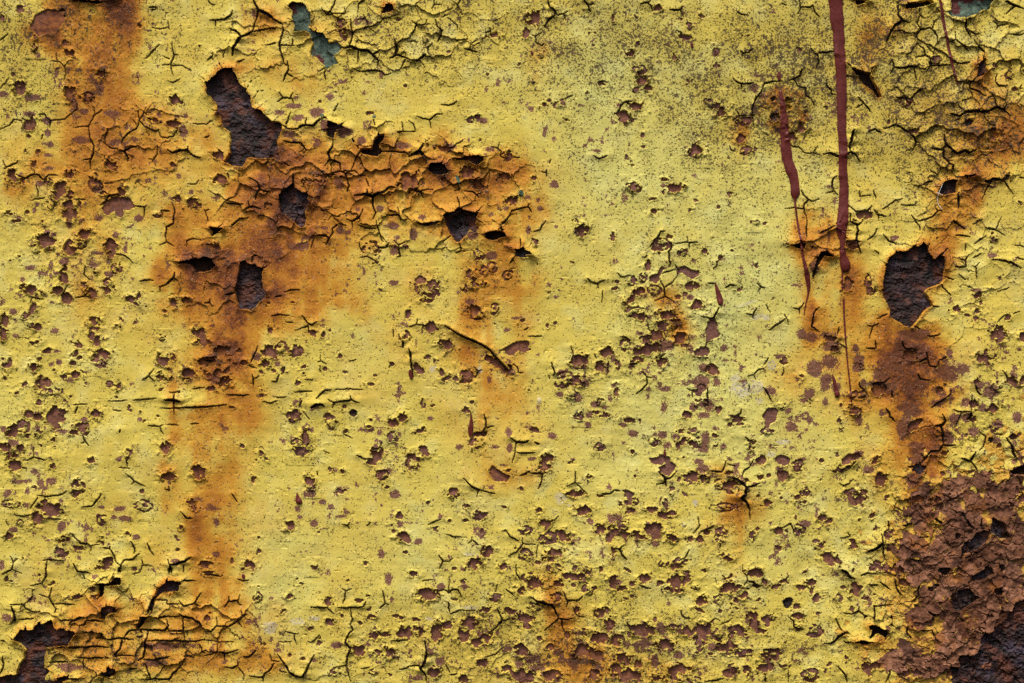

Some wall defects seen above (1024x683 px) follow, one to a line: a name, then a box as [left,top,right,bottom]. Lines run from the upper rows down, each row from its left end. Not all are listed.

spalling [277,0,343,70]
spalling [194,57,282,185]
crack [148,0,546,265]
crack [734,1,1024,322]
rust [0,0,569,683]
crack [445,326,519,377]
crack [549,326,665,393]
crack [695,258,887,358]
rust [752,41,1024,683]
spalling [866,230,955,327]
spalling [0,612,129,683]
crack [0,491,388,681]